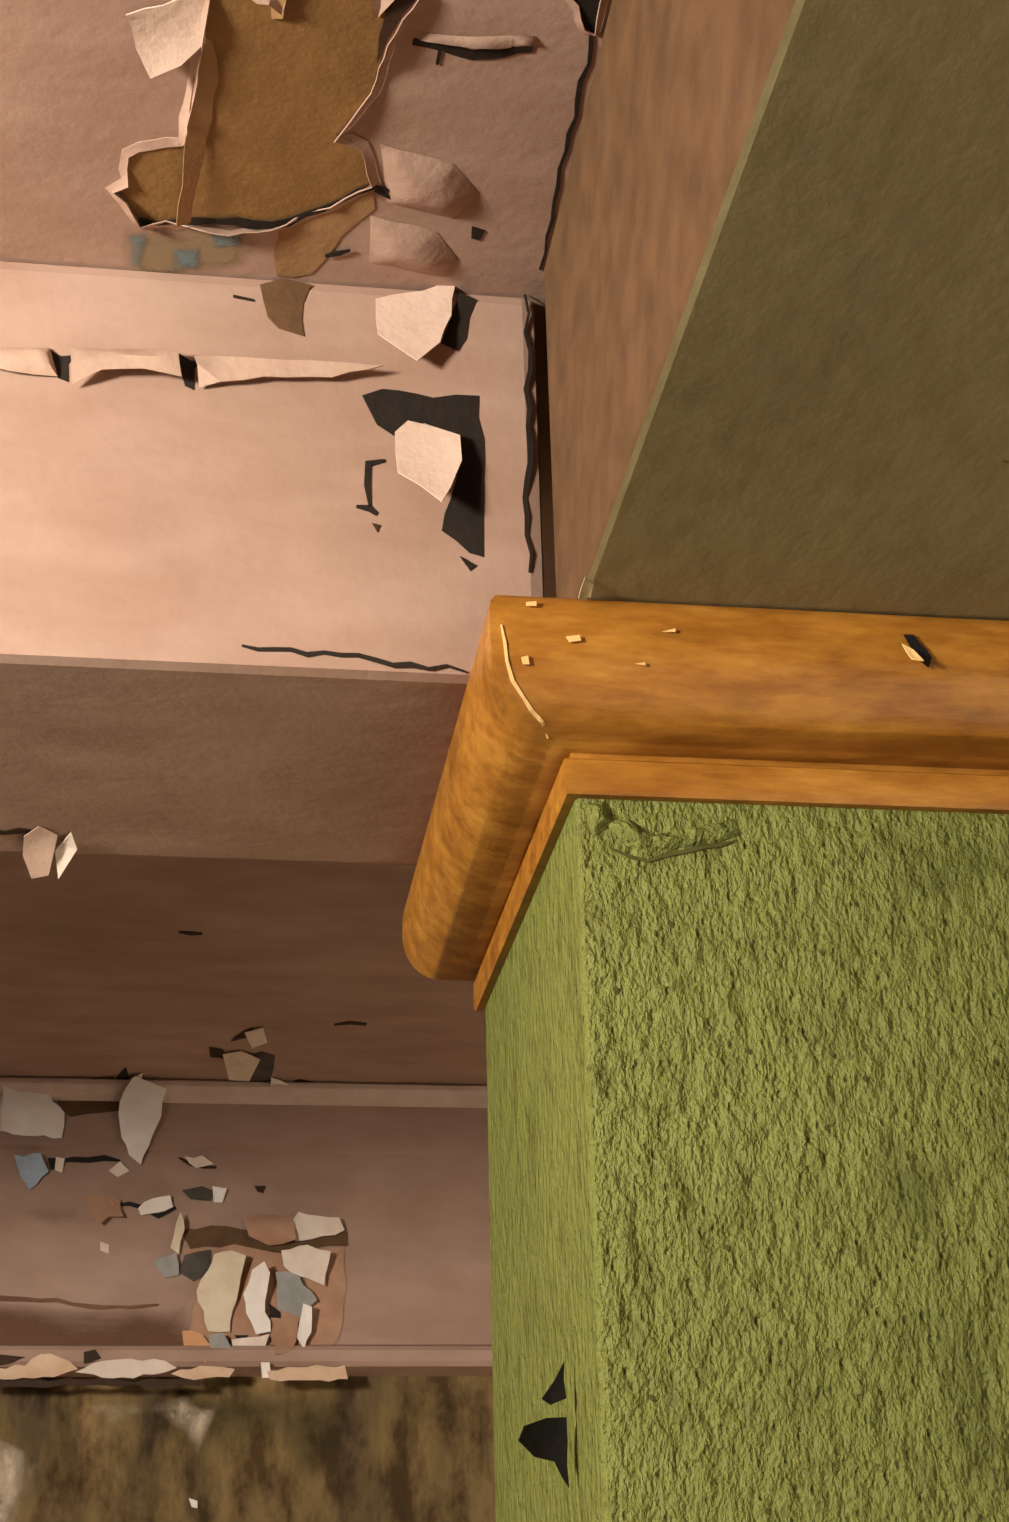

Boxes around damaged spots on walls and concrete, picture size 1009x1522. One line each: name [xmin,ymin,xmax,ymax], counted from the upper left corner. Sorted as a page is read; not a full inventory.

peeling [105,0,424,336]
peeling [471,226,485,241]
peeling [0,347,383,390]
peeling [376,286,477,361]
flaking render [362,389,485,571]
crack [242,644,464,672]
peeling [500,624,549,739]
peeling [209,1027,313,1086]
peeling [0,1068,167,1189]
peeling [0,1155,348,1388]
peeling [518,1362,569,1487]
leakage [0,1453,17,1519]